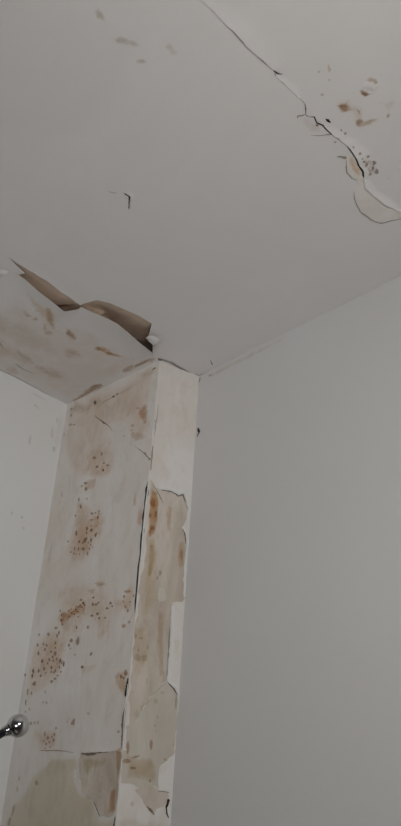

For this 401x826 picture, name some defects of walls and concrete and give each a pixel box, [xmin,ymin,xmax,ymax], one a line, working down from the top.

crack [297,114,374,179]
peeling [337,153,401,224]
peeling [7,253,160,362]
crack [135,409,158,607]
peeling [74,479,191,818]
crack [121,678,129,748]